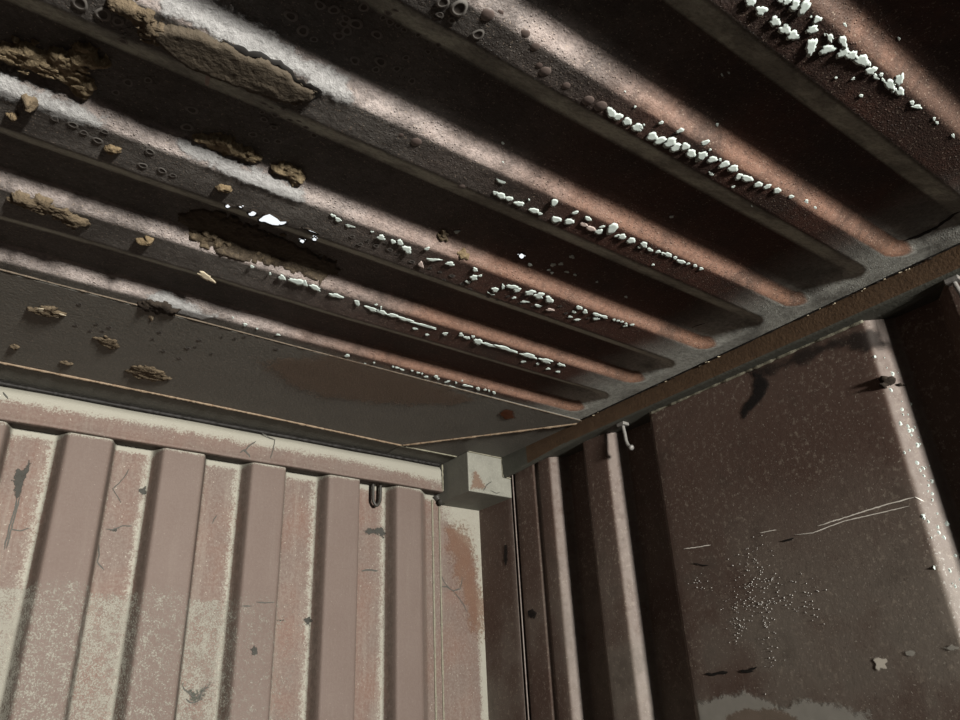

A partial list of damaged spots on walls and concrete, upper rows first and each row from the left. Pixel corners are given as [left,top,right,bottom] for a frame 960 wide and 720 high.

peeling [0,50,107,127]
peeling [121,0,354,105]
peeling [185,228,232,250]
peeling [269,272,566,373]